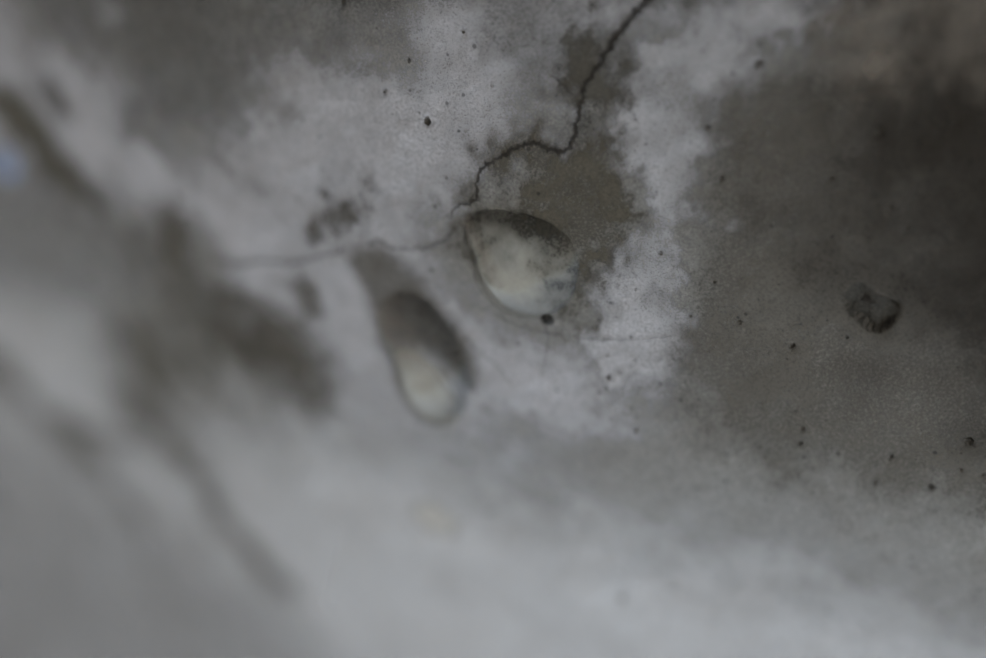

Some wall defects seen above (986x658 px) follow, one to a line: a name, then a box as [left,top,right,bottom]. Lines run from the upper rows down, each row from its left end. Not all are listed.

crack [450,0,651,218]
spalling [842,282,902,334]